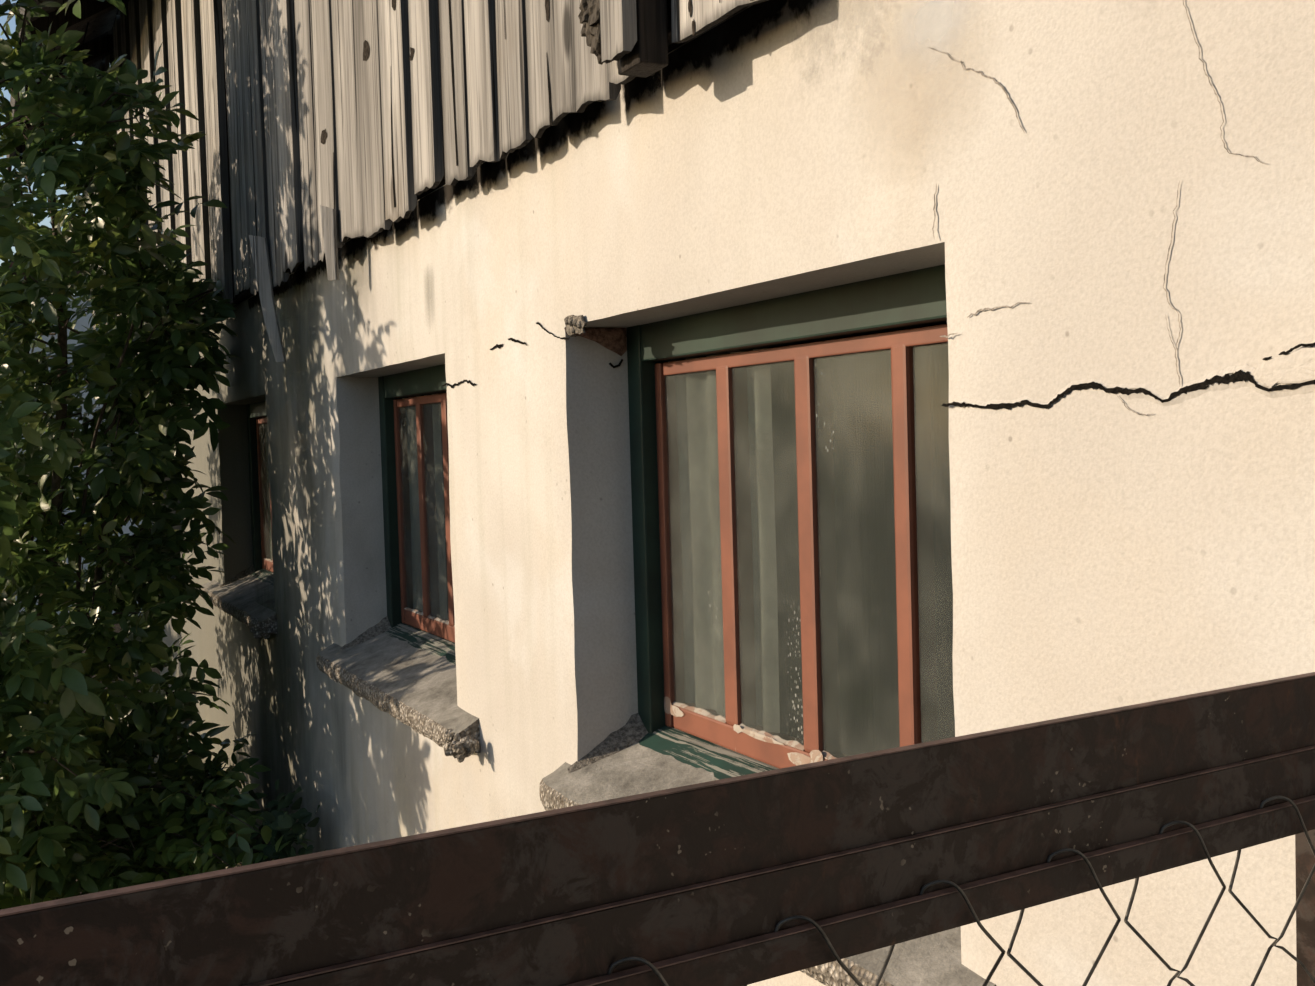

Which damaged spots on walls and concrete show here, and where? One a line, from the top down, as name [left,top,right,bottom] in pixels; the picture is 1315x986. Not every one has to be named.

water stain [622,0,814,112]
crack [928,47,1024,132]
crack [1183,0,1267,164]
crack [490,322,570,350]
crack [940,181,1315,416]
crack [442,380,476,388]
peeling [664,696,684,717]
peeling [733,724,823,765]